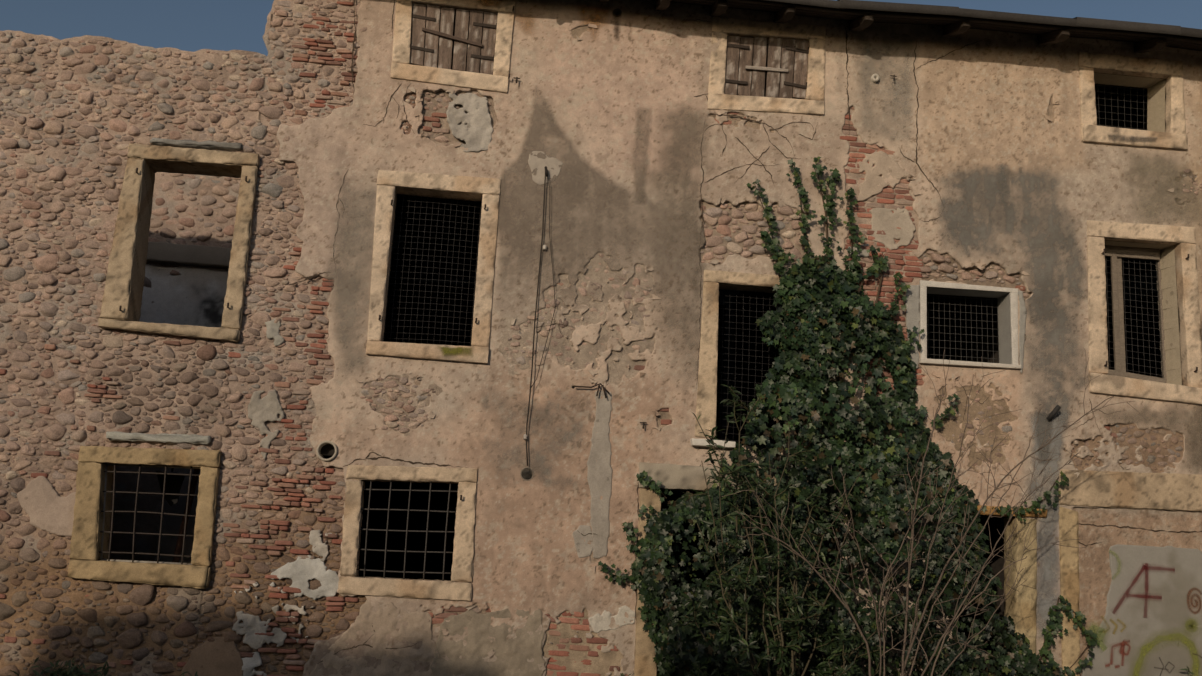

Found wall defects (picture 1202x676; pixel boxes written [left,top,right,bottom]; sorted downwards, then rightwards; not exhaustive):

flaking render [400,86,497,147]
peeling [498,252,661,385]
water stain [498,103,702,274]
flaking render [699,197,811,265]
crack [694,94,818,380]
crack [843,25,851,133]
flaking render [840,106,1031,473]
crack [900,38,987,222]
water stain [941,165,1084,630]
flaking render [1064,423,1184,477]
peeling [181,530,339,676]
flaking render [538,609,634,676]